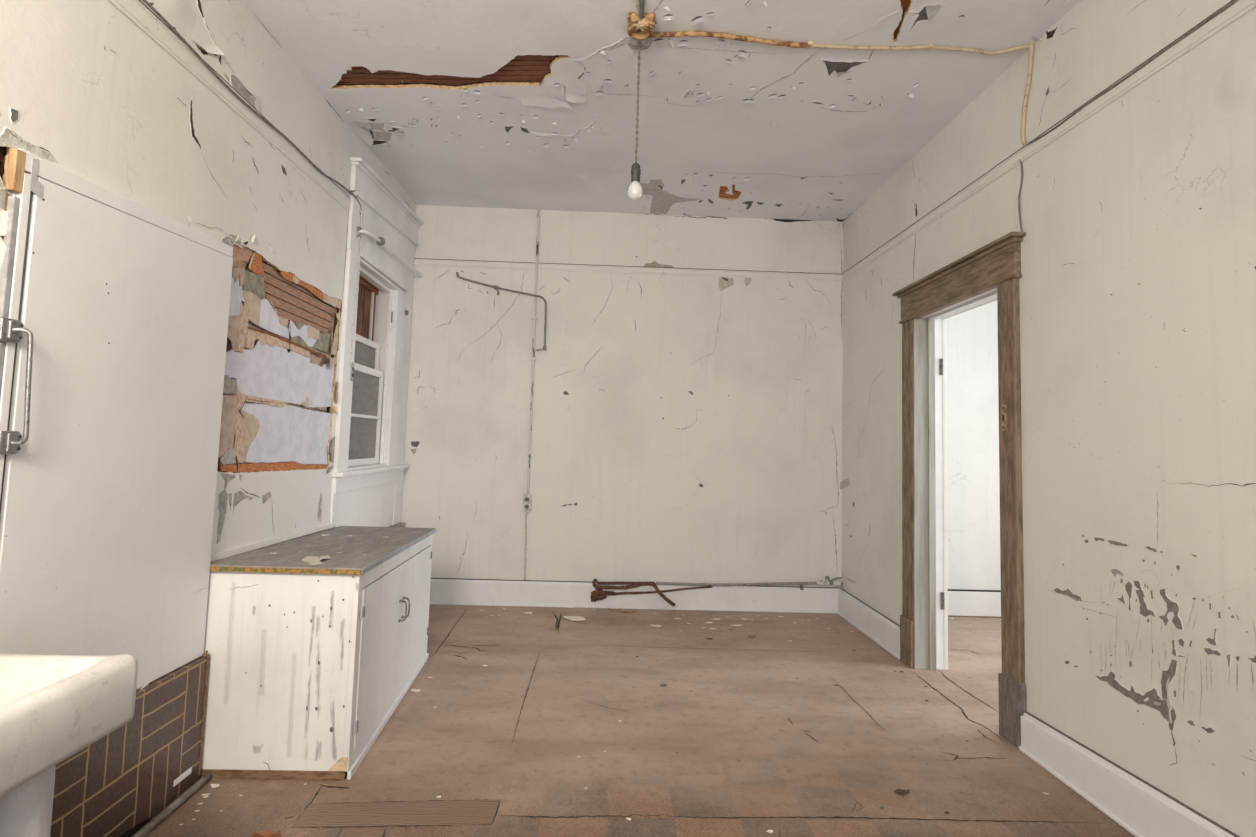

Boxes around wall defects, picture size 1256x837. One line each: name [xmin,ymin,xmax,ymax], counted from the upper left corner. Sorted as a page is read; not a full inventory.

peeling [894,0,945,38]
spalling [337,42,732,149]
flaking render [0,146,10,270]
crack [180,96,313,248]
peeling [624,172,784,215]
flaking render [215,233,342,545]
peeling [1082,535,1129,547]
crack [1157,481,1256,550]
peeling [1044,565,1256,766]